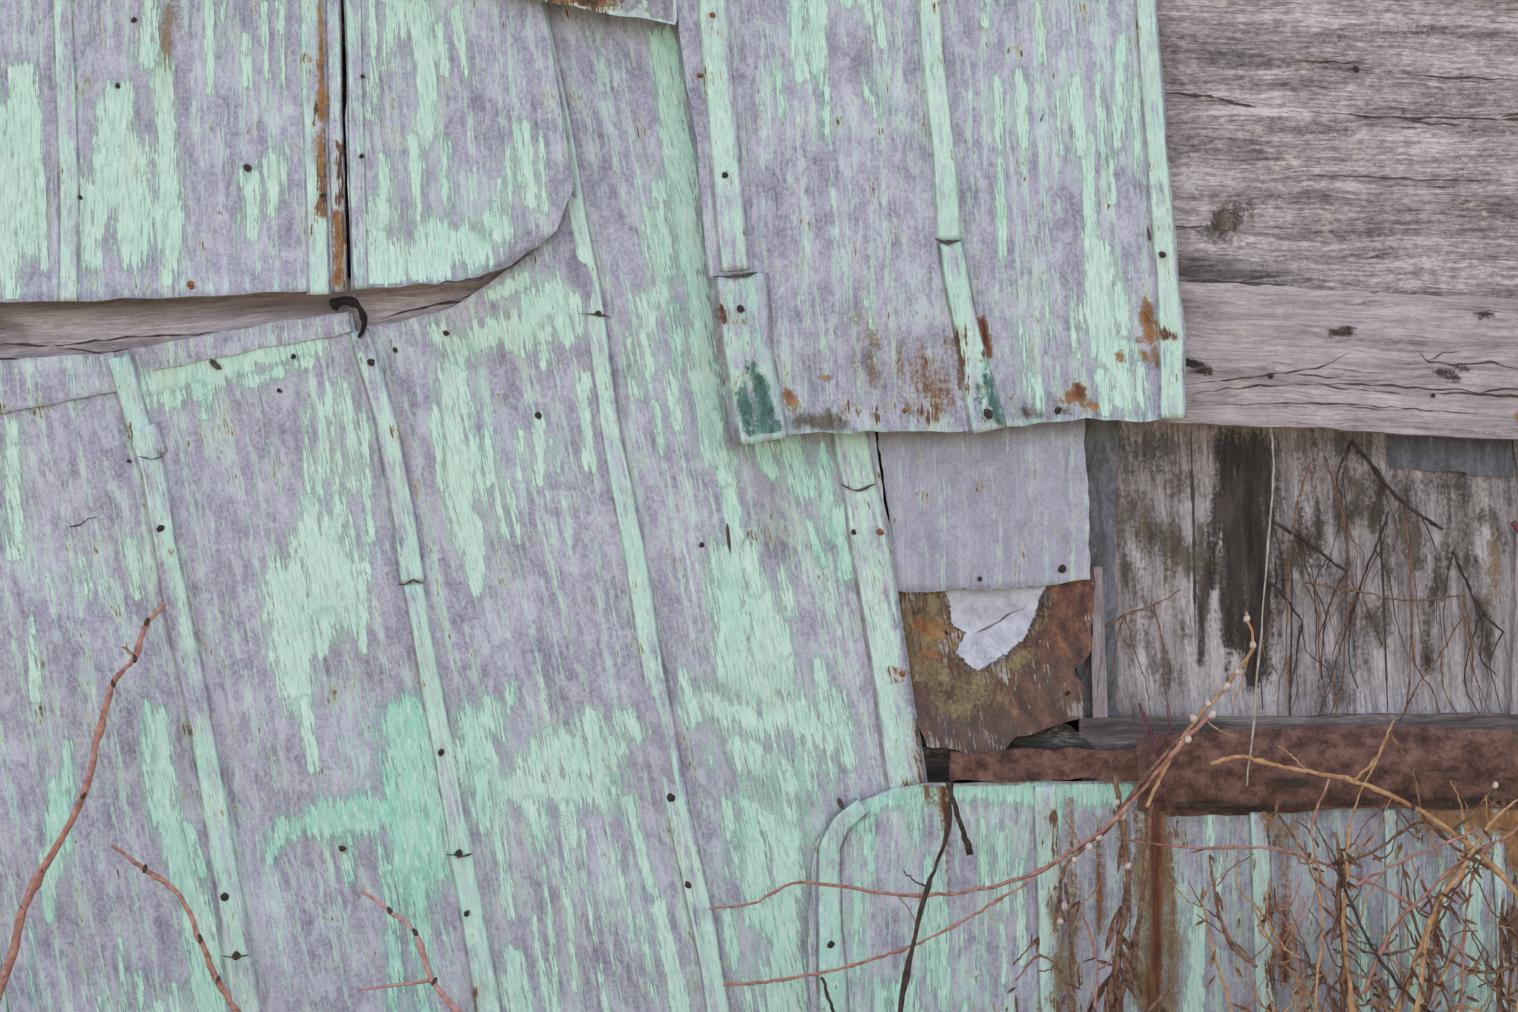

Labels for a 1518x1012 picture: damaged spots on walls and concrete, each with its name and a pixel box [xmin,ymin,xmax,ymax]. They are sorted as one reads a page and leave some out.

peeling [78,0,185,295]
peeling [258,375,452,1012]
peeling [364,0,585,597]
peeling [619,0,858,1012]
rust [851,316,968,421]
rust [977,316,992,358]
rust [1056,382,1099,412]
rust [1115,294,1159,368]
damp [1116,428,1511,704]
peeling [449,680,693,1012]
peeling [851,782,1138,1012]
rust [923,746,1378,1012]